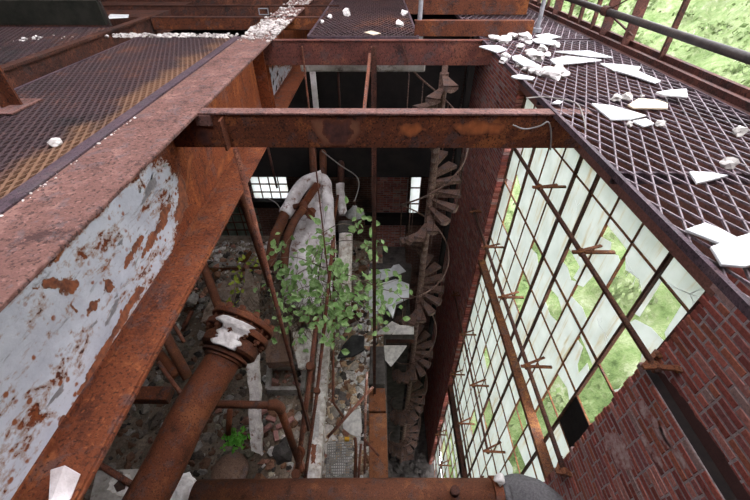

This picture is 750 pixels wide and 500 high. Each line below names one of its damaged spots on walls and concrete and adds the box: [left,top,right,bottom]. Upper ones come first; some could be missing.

corrosion [311,118,361,146]
corrosion [398,122,427,138]
corrosion [453,120,508,136]
corrosion [124,172,188,270]
corrosion [32,273,80,295]
peeling [0,157,179,500]